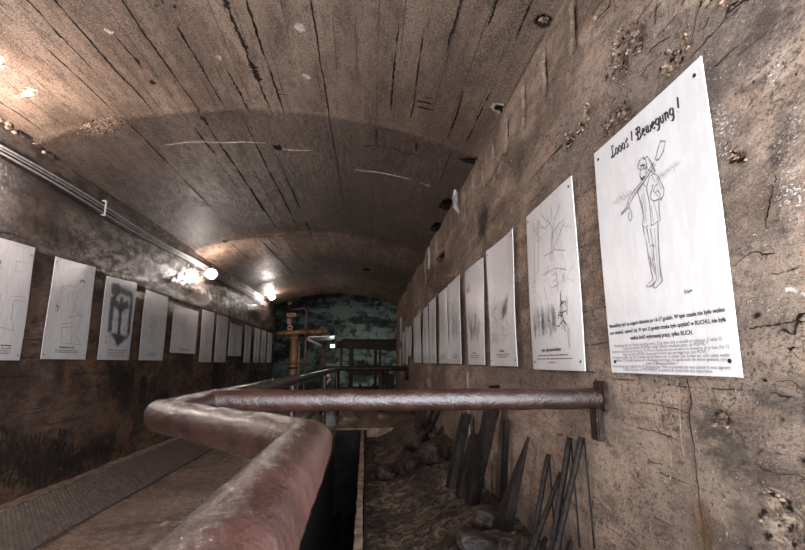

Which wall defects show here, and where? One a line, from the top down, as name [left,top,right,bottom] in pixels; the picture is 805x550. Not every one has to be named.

spalling [602,12,646,91]
crack [641,0,749,76]
spalling [598,100,634,141]
crack [747,313,805,399]
crack [637,379,700,503]